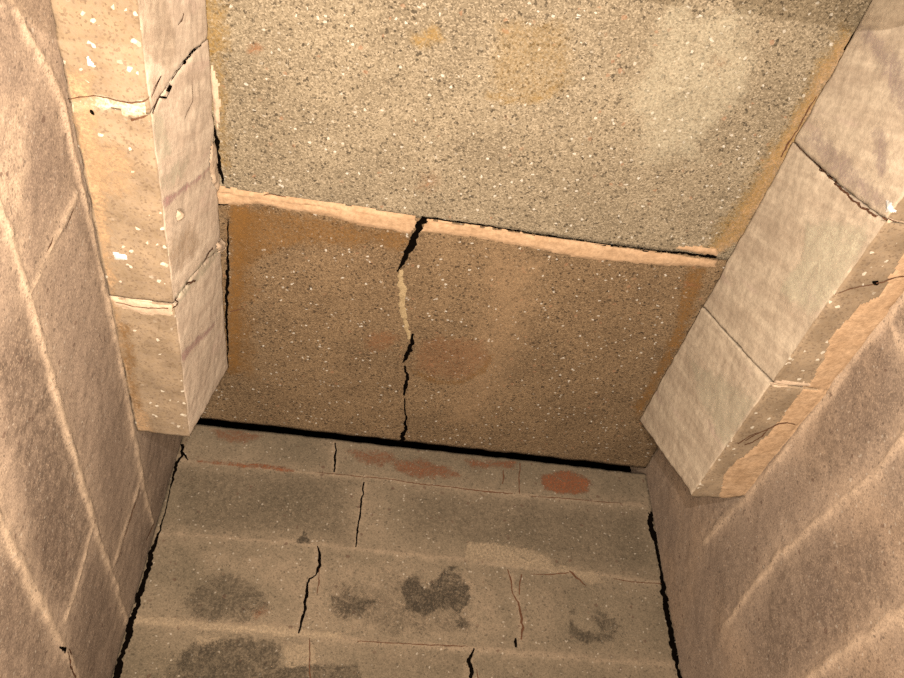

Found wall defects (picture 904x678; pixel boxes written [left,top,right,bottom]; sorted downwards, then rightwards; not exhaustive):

crack [68,45,201,121]
crack [781,96,897,222]
crack [396,216,717,442]
crack [113,444,188,678]
leakage [134,614,343,668]
crack [298,546,321,678]
crack [357,641,479,678]
crack [613,511,682,678]